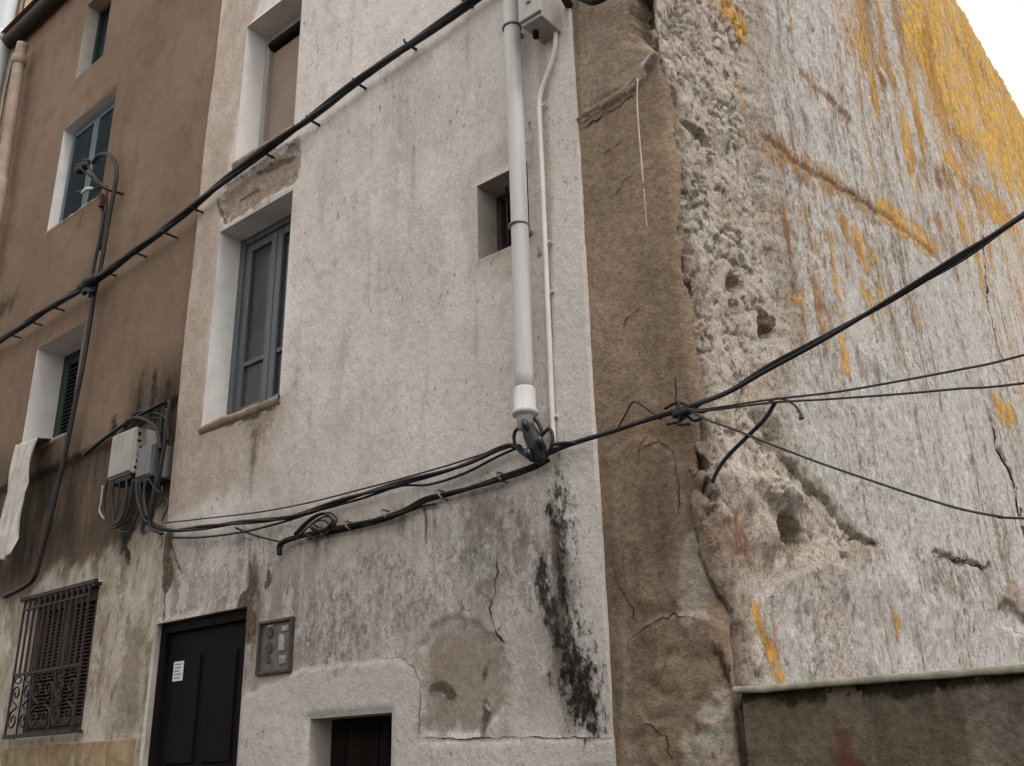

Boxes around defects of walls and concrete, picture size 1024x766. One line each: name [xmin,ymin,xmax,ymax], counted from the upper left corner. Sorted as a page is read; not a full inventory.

peeling [217,137,301,224]
spalling [645,0,905,766]
water stain [120,492,151,565]
crack [936,427,1024,579]
crack [487,552,509,643]
water stain [534,467,610,745]
crack [617,585,706,647]
peeling [385,602,509,739]
crack [644,723,673,760]